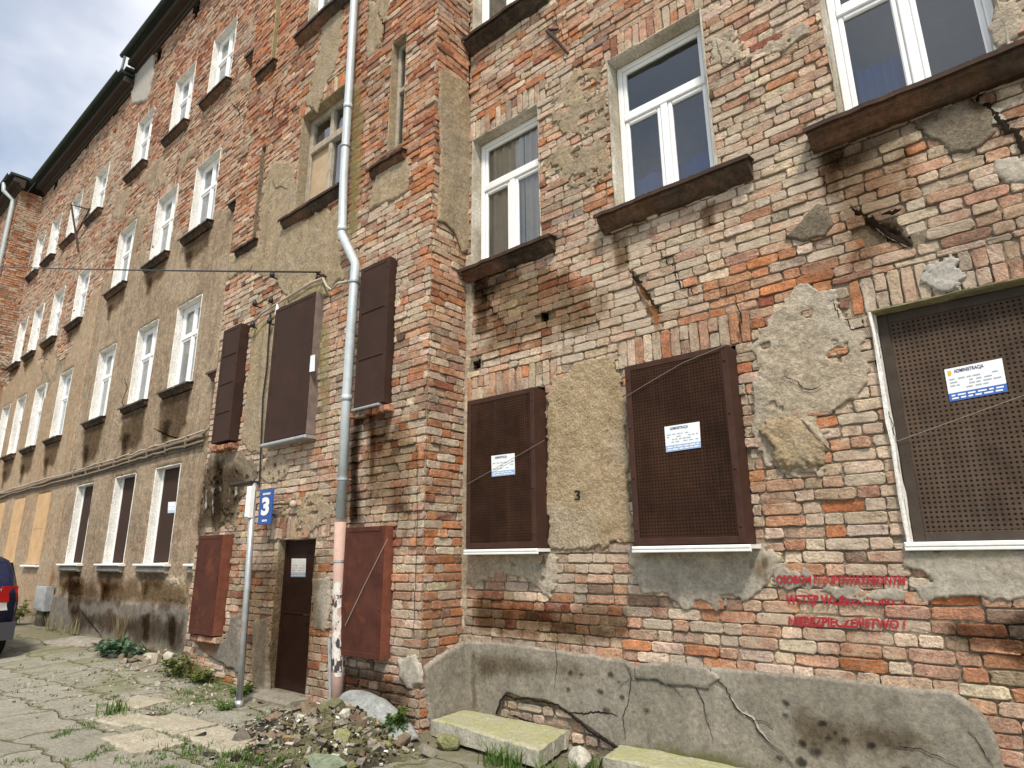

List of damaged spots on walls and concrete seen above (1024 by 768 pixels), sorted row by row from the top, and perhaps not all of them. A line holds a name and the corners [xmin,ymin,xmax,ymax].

crack [971,92,1024,155]
spalling [495,693,618,751]
crack [619,662,794,767]